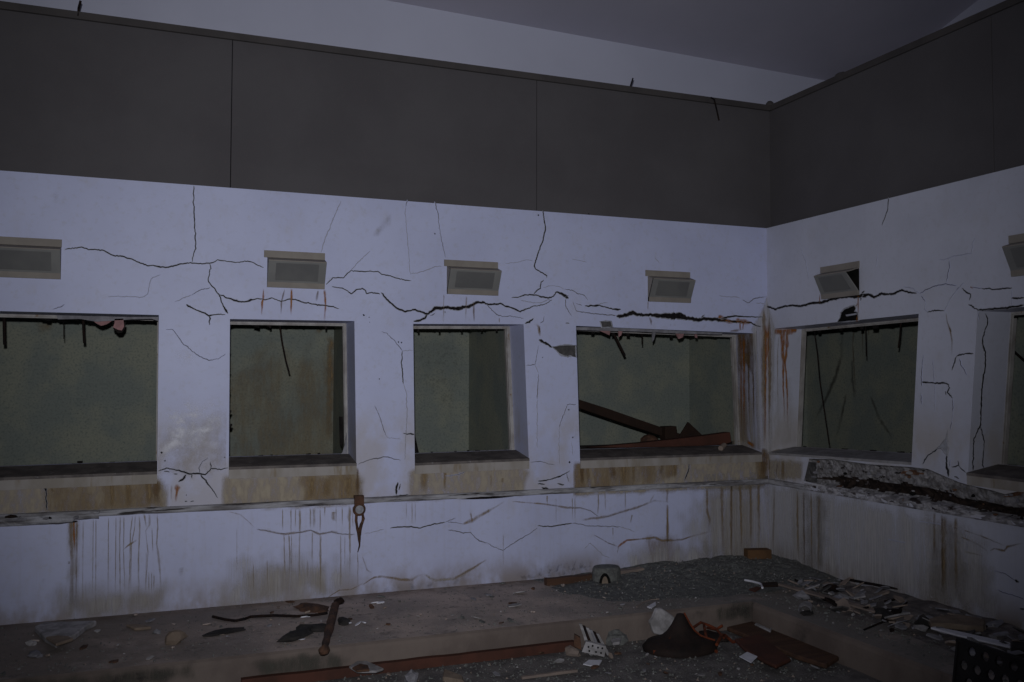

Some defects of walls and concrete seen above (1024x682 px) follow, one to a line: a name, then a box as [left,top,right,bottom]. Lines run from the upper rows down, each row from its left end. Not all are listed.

crack [65,186,1024,558]
rust [718,299,801,479]
damp [0,479,167,518]
damp [223,471,361,540]
damp [572,462,994,615]
spalling [804,459,1024,527]